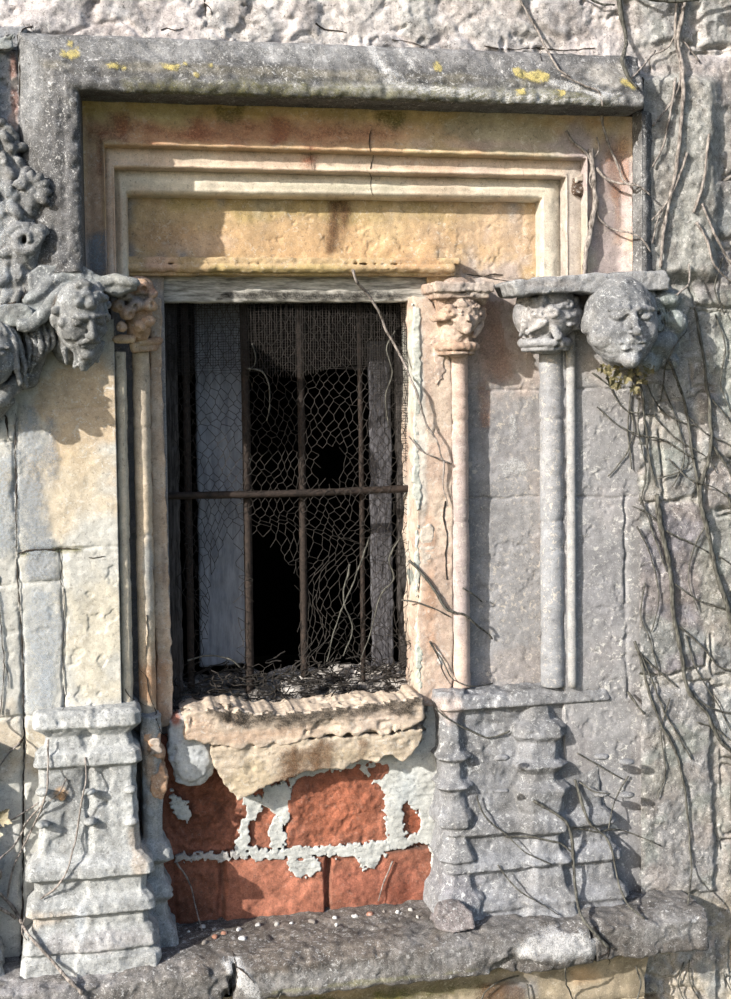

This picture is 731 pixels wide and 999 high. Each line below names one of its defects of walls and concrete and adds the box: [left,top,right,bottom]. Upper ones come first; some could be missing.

leakage [17,32,653,272]
crack [0,414,103,960]
flaking render [174,706,437,879]
crack [232,951,254,996]